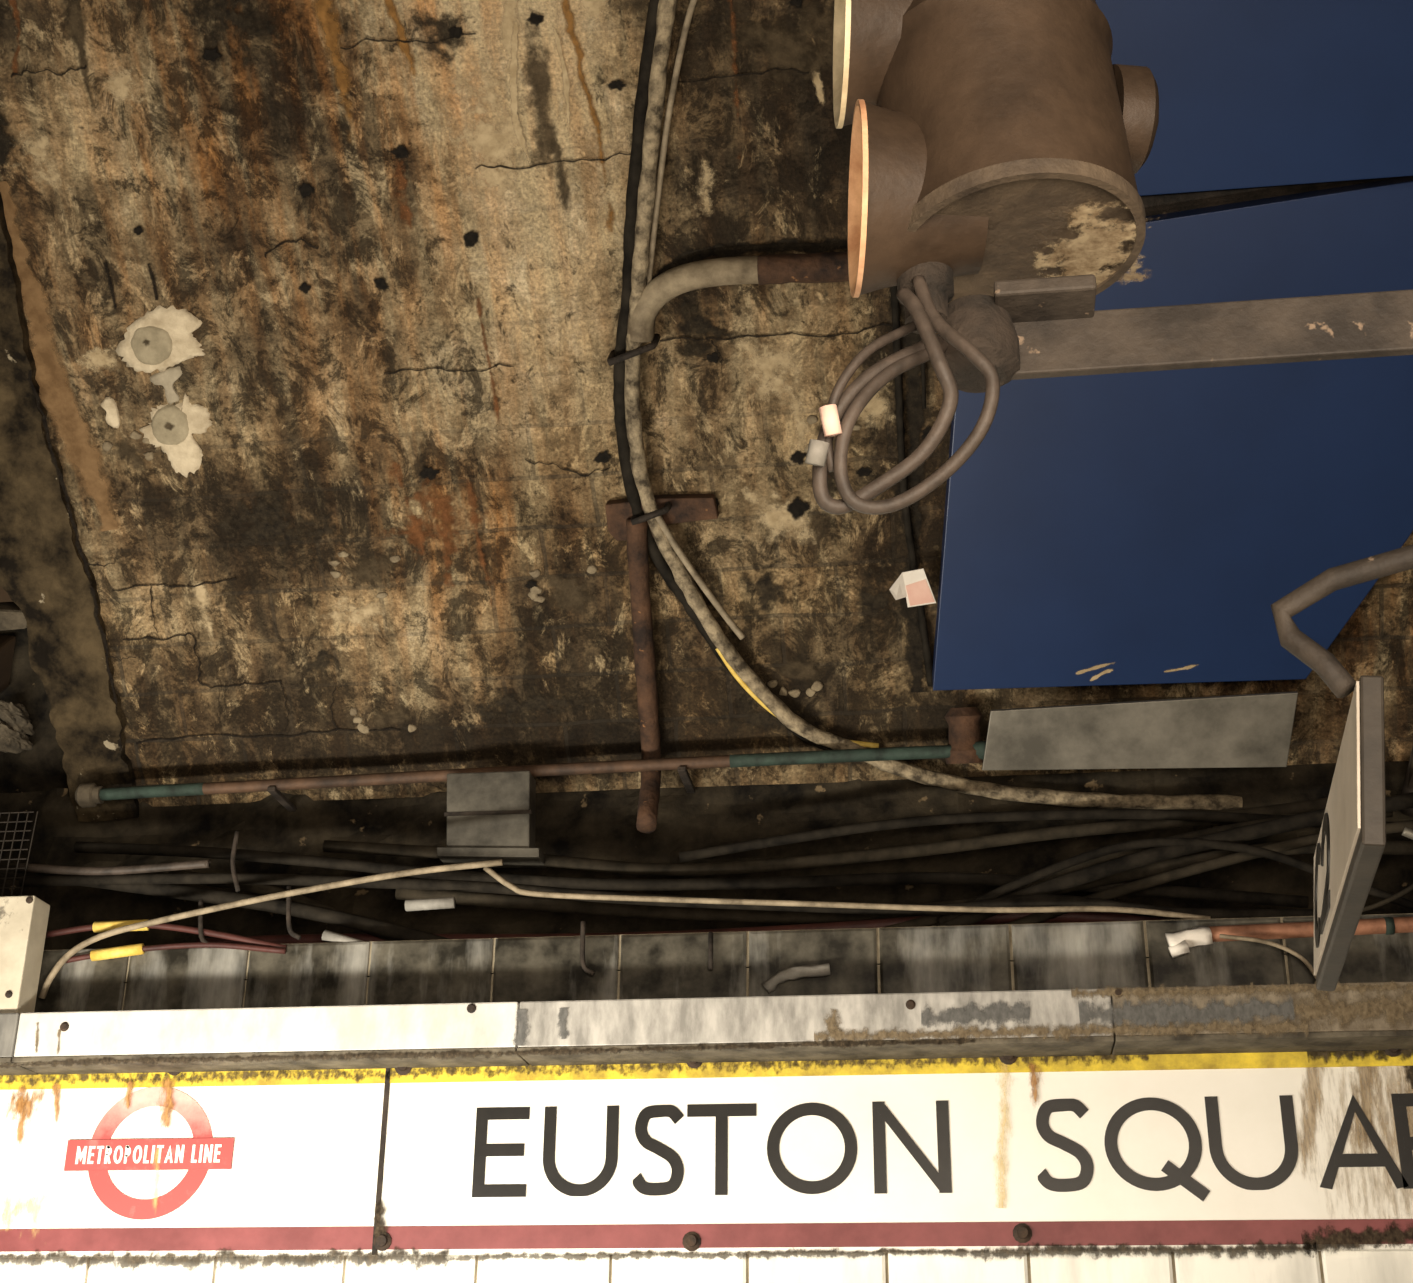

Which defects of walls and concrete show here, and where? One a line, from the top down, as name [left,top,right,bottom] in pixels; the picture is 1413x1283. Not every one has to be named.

rust [384,0,415,75]
water stain [725,8,833,102]
water stain [411,10,570,209]
rust [562,0,605,176]
crack [475,152,631,170]
water stain [674,299,809,452]
water stain [744,489,814,552]
water stain [194,583,212,634]
water stain [740,569,802,621]
rust [7,1084,60,1143]
rust [125,1081,134,1108]
rust [160,1078,174,1127]